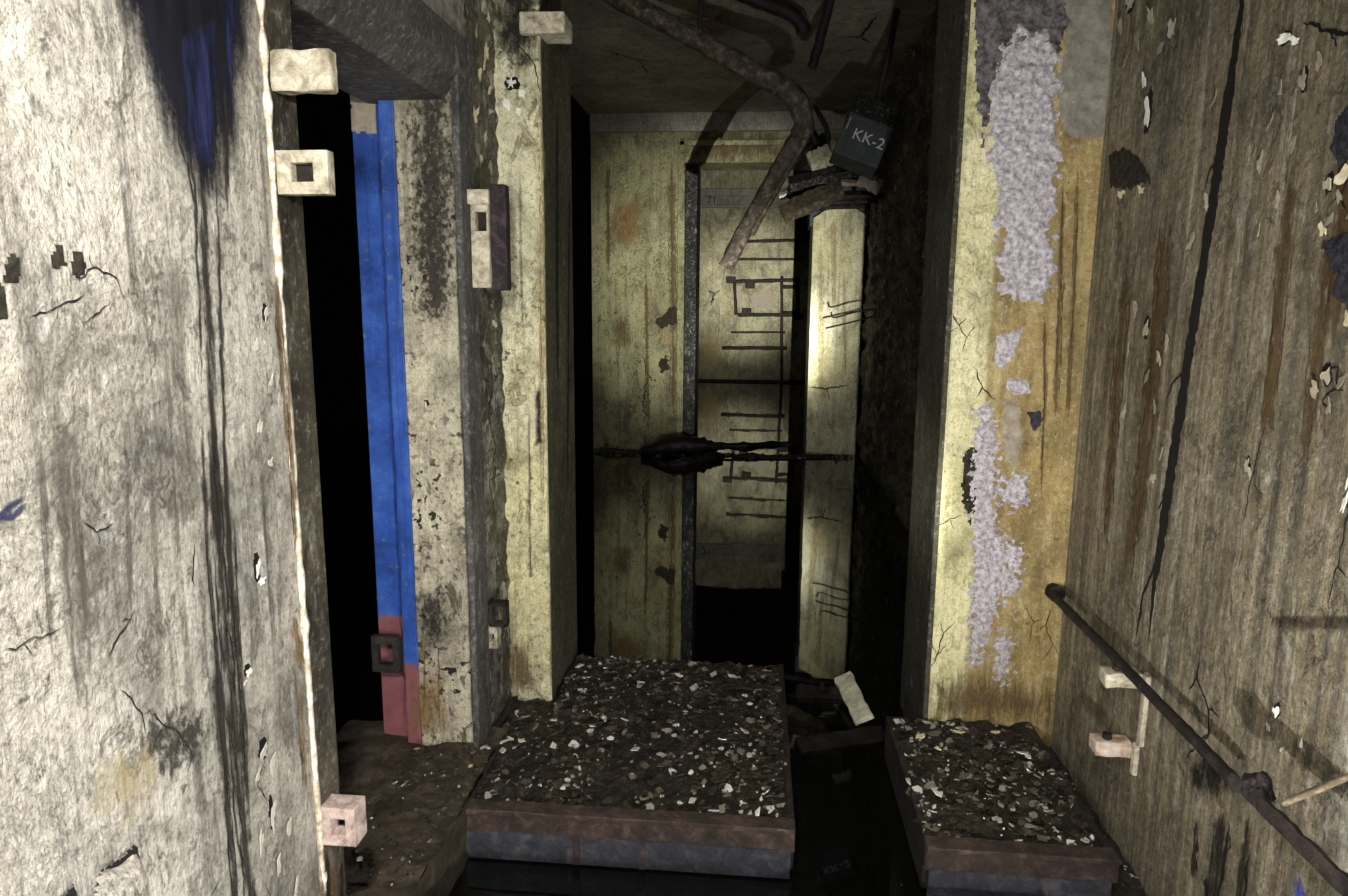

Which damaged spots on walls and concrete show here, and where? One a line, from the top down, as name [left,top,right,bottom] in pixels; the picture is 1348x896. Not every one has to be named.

hole [0,253,21,319]
hole [51,245,87,278]
corrosion [667,164,677,307]
corrosion [690,131,782,161]
peeling [961,0,1176,304]
spalling [1314,105,1348,327]
corrosion [669,325,677,405]
peeling [961,327,1042,687]